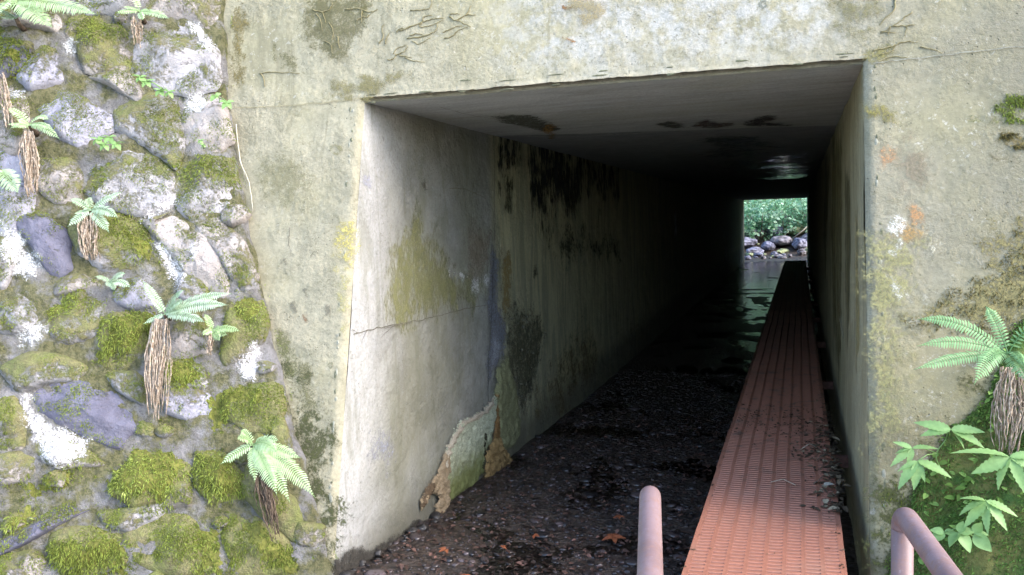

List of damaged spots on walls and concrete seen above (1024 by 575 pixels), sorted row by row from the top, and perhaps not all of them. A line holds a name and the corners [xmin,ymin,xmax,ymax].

crack [352,151,497,400]
water stain [497,137,620,263]
peeling [333,395,497,575]